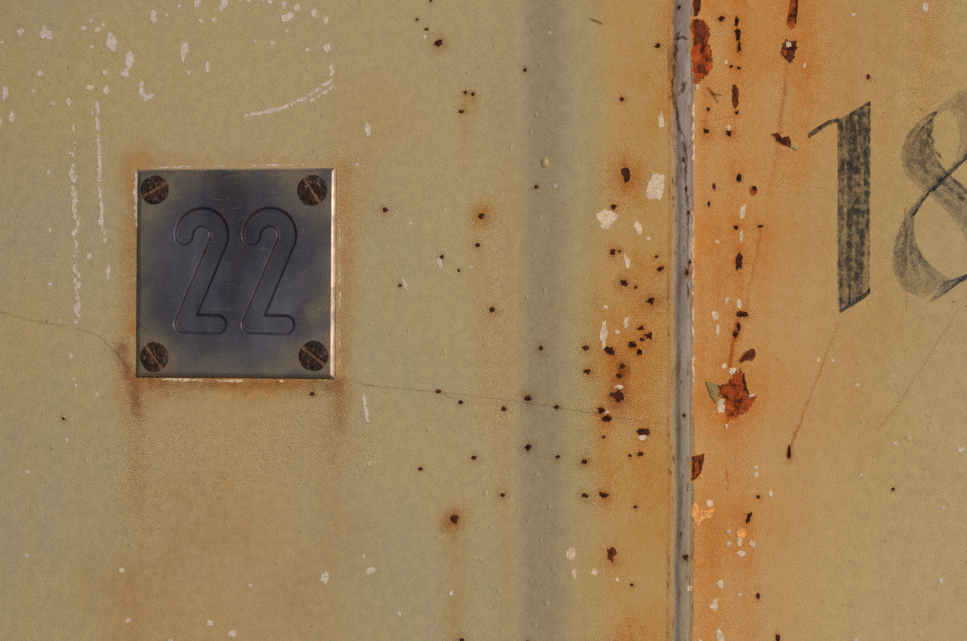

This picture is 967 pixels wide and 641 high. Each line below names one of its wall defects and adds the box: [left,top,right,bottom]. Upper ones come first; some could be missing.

peeling [194,0,329,32]
peeling [81,19,117,51]
peeling [120,51,134,77]
peeling [181,42,190,75]
peeling [138,81,154,101]
peeling [86,70,110,243]
peeling [706,348,758,428]
peeling [690,452,705,483]
peeling [691,499,716,526]
peeling [726,512,756,556]